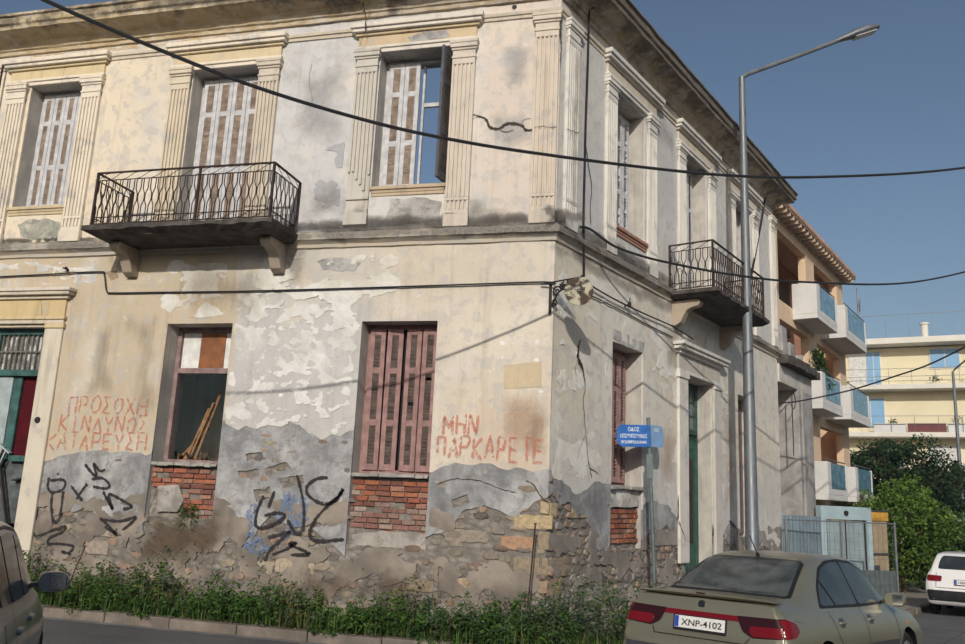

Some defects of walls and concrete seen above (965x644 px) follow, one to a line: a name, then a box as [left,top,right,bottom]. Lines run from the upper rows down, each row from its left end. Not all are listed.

crack [473,114,579,133]
flaking render [40,254,685,631]
crack [575,339,598,477]
peeling [585,274,734,407]